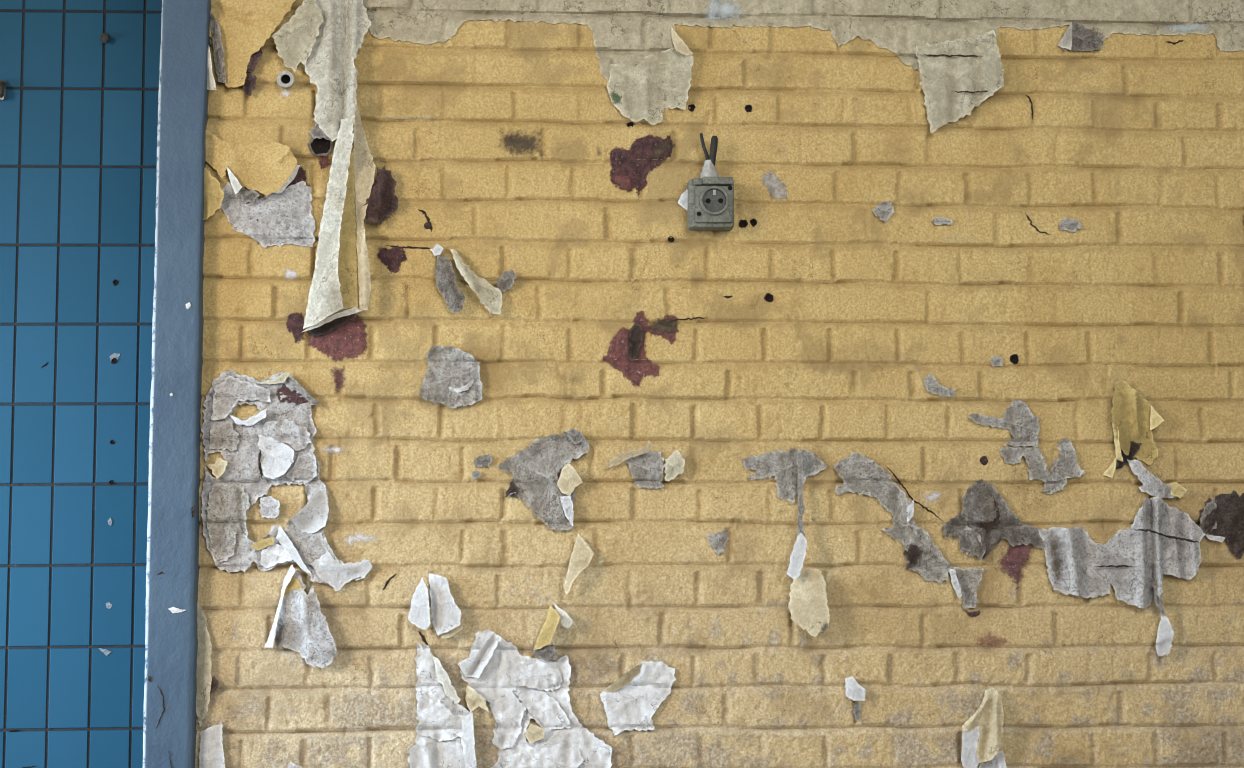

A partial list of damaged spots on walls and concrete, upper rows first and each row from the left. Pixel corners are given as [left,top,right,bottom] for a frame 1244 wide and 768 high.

flaking render [204,0,1244,392]
peeling [191,370,372,668]
peeling [420,345,482,408]
peeling [408,428,685,768]
peeling [923,374,956,397]
peeling [961,687,1007,768]
peeling [742,380,1244,656]